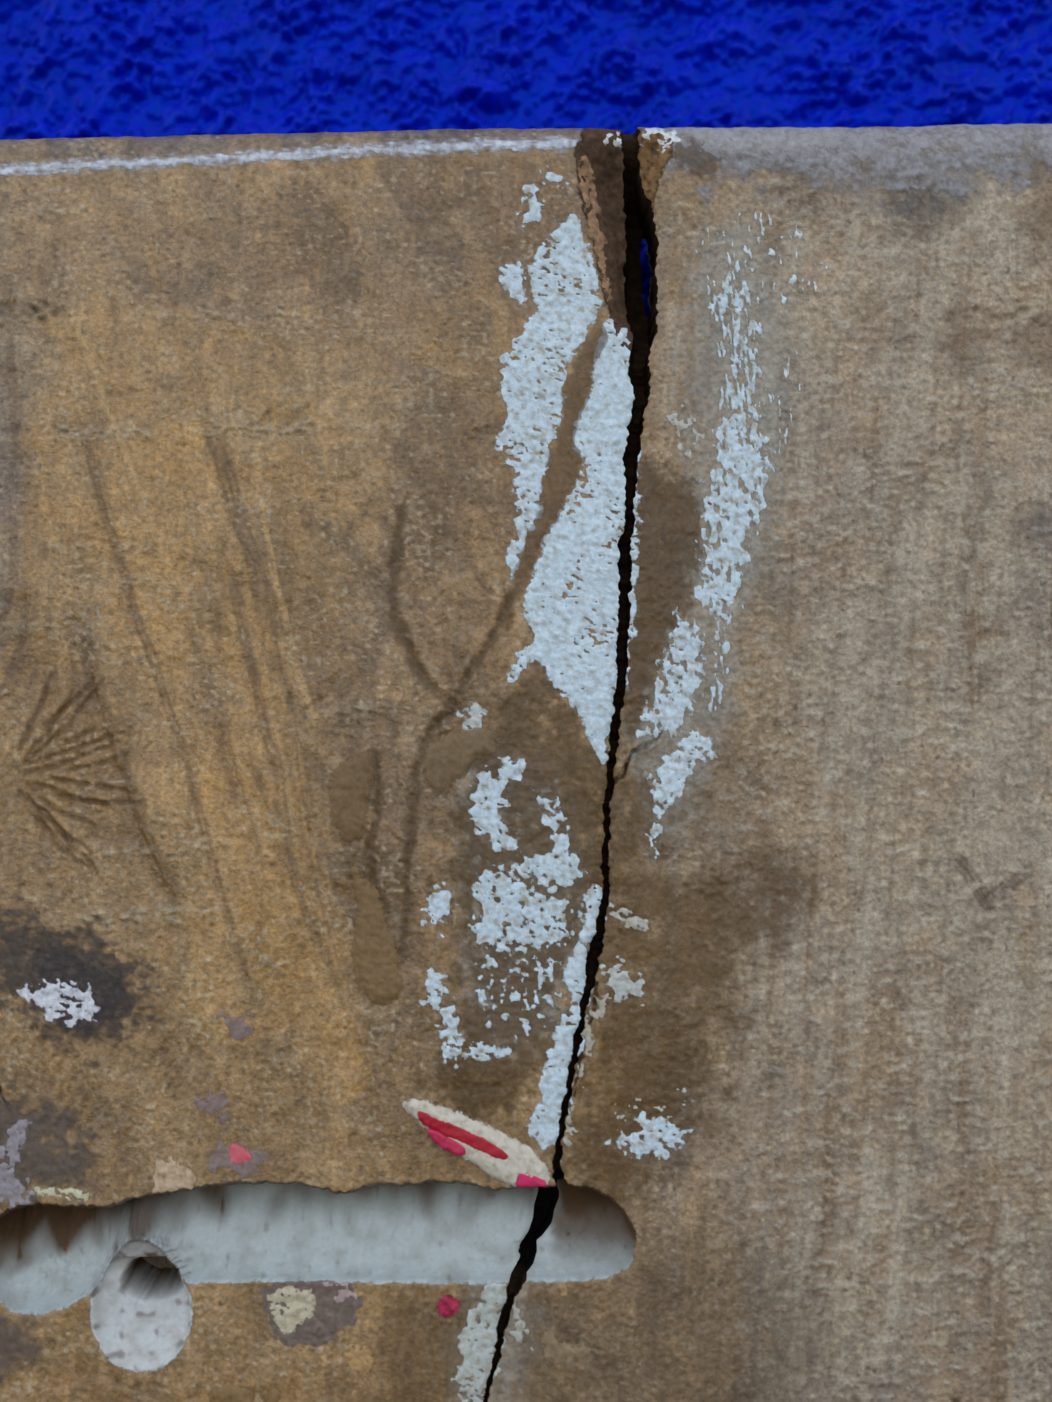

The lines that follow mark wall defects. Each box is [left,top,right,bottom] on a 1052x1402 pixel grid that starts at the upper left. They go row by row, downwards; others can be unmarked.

crack [483,127,663,1402]